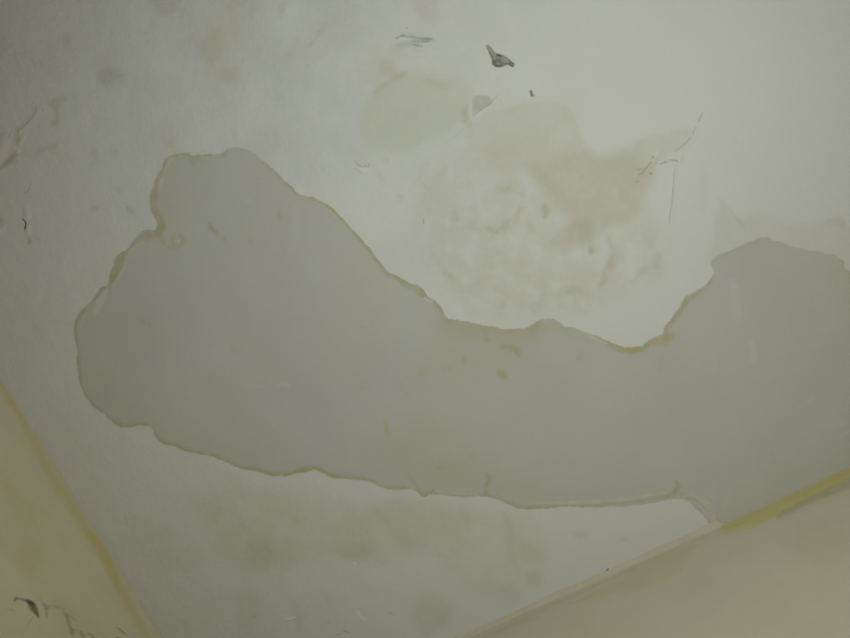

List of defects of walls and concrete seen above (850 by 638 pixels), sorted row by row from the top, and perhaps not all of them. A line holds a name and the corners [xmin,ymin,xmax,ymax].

peeling [74,148,850,523]
water stain [349,50,698,329]